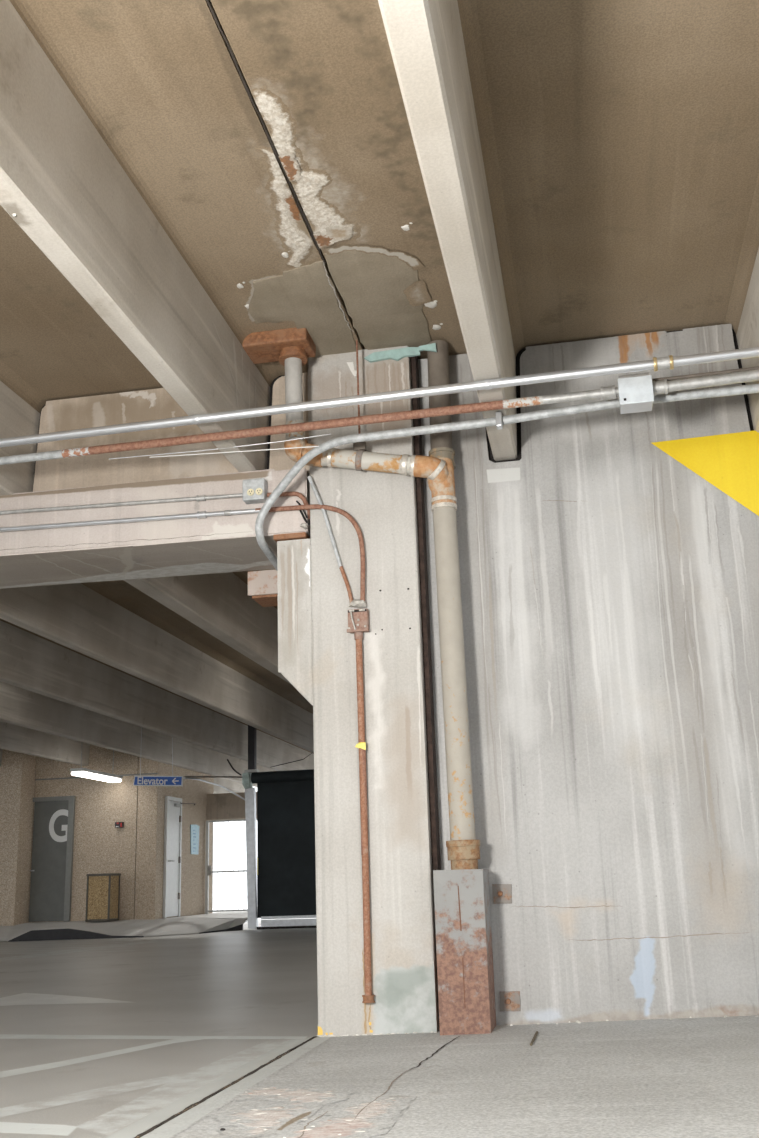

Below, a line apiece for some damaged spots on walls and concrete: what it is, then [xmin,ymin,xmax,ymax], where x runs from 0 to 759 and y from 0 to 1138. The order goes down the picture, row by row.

crack [193,0,326,264]
water stain [210,0,447,280]
rust [357,928,379,1035]
crack [354,1036,459,1120]